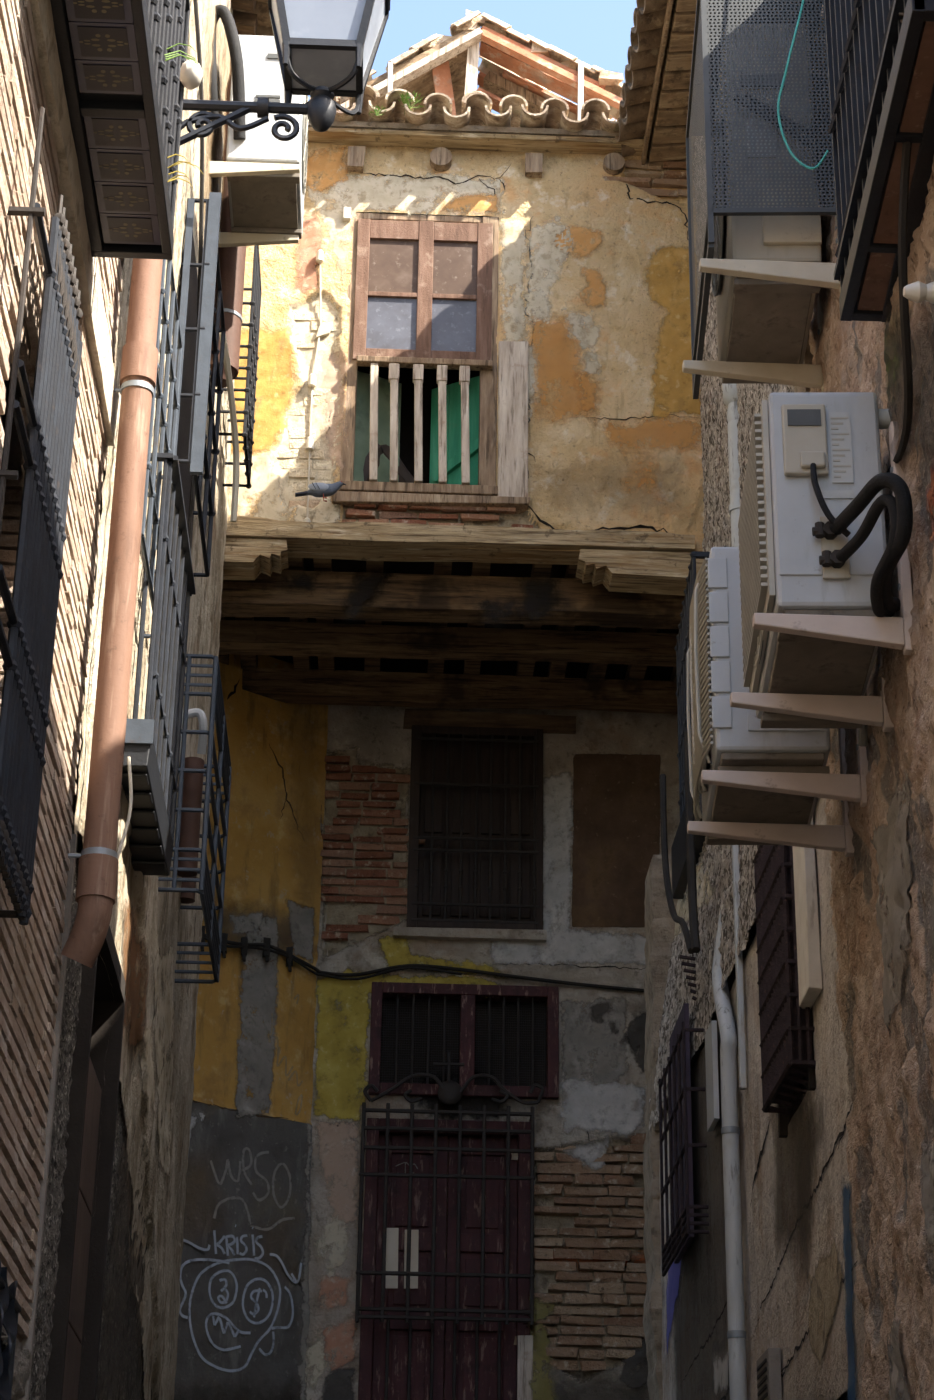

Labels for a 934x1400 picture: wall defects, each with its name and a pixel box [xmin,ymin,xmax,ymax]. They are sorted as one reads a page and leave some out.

crack [366,166,510,199]
flaking render [227,147,606,528]
crack [524,218,535,356]
flaking render [645,246,701,417]
crack [269,744,305,841]
flaking render [229,746,648,1400]